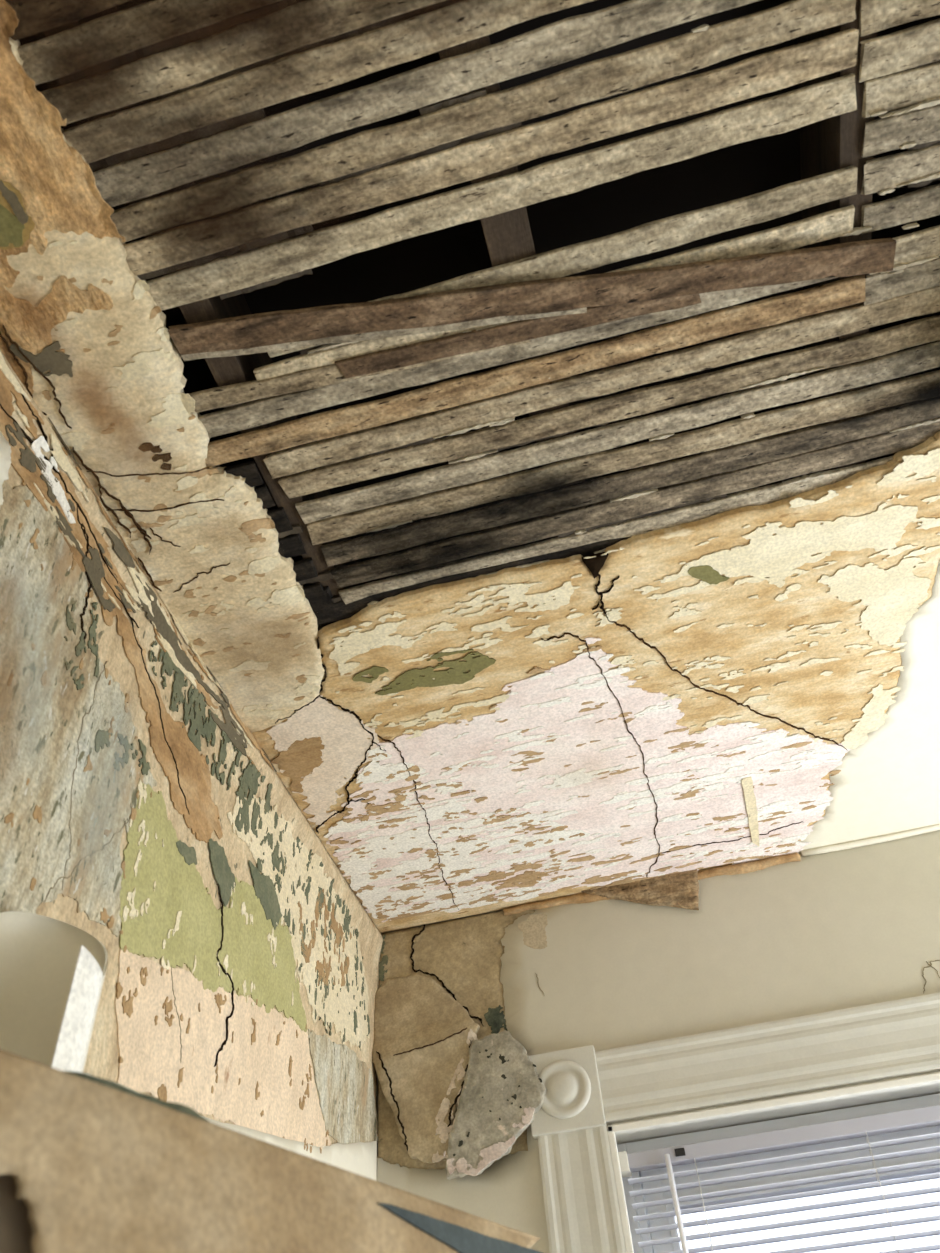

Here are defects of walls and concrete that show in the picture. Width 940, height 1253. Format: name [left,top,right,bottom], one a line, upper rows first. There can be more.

peeling [5,425,38,479]
crack [0,325,230,907]
crack [541,569,848,878]
peeling [137,777,147,809]
crack [275,636,459,910]
peeling [167,911,182,939]
crack [171,965,182,1062]
crack [214,884,234,1067]
peeling [301,897,321,963]
peeling [315,951,332,986]
peeling [320,895,344,954]
crack [376,924,484,1151]